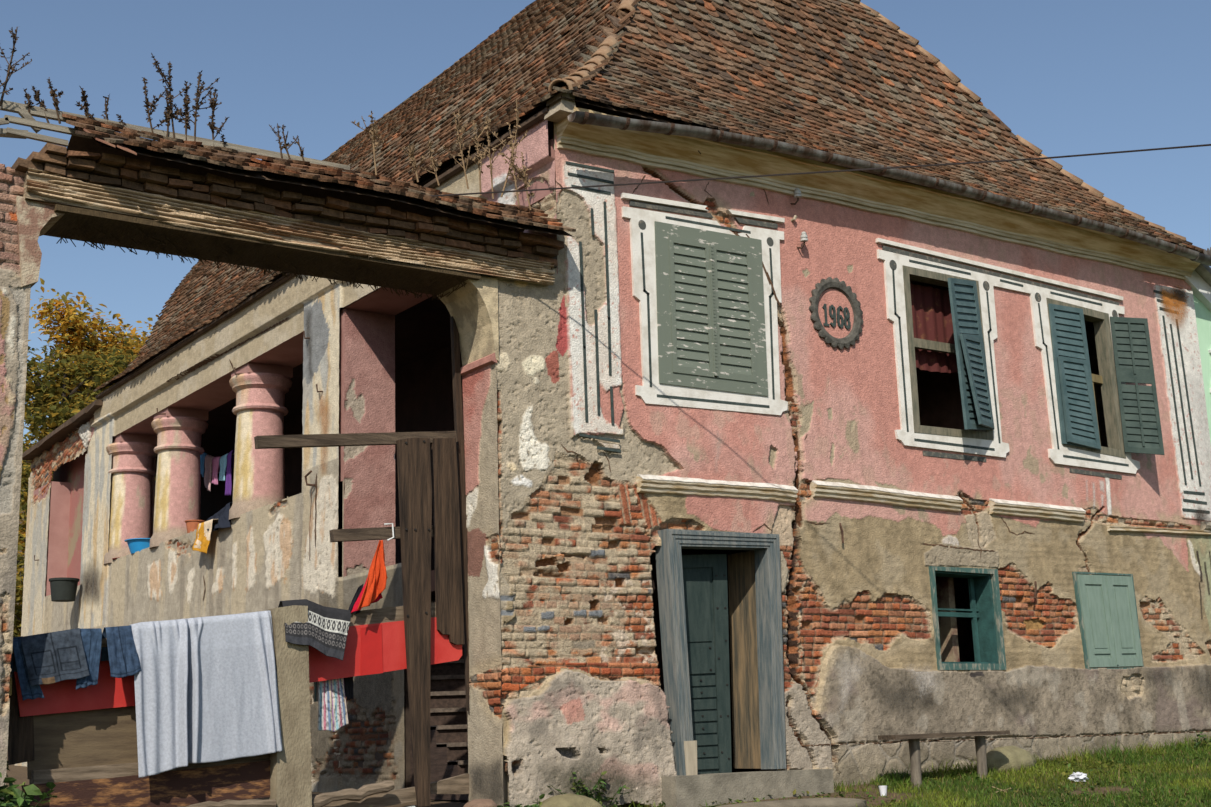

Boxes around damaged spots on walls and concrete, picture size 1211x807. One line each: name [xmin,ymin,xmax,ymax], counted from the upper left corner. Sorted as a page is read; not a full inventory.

peeling [0,164,94,514]
peeling [209,473,370,598]
flaking render [345,378,366,423]
flaking render [344,446,367,462]
peeling [466,485,479,529]
flaking render [469,168,705,719]
peeling [769,444,778,470]
crack [632,167,1209,773]
flaking render [0,591,13,716]
flaking render [771,442,932,769]
flaking render [997,562,1078,649]
flaking render [1140,596,1211,663]